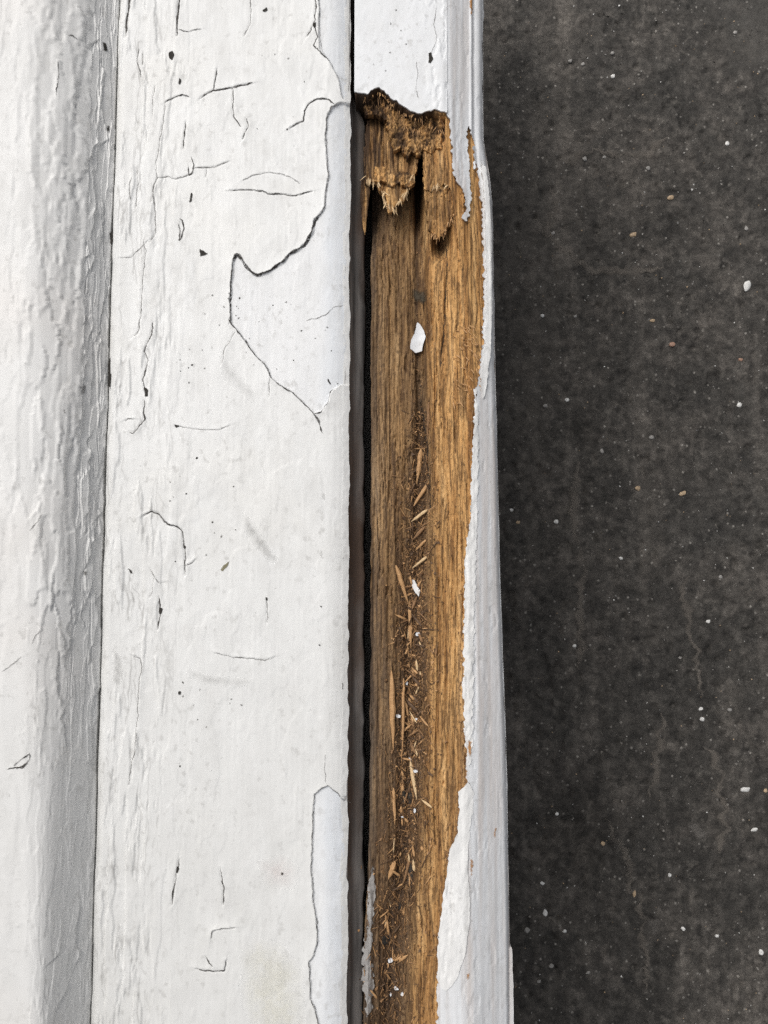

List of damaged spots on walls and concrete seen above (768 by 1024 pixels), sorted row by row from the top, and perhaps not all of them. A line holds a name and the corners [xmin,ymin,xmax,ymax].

crack [123,0,312,434]
crack [292,98,334,127]
crack [307,0,328,59]
crack [146,511,195,570]
peeling [308,765,349,1024]
peeling [437,782,474,991]